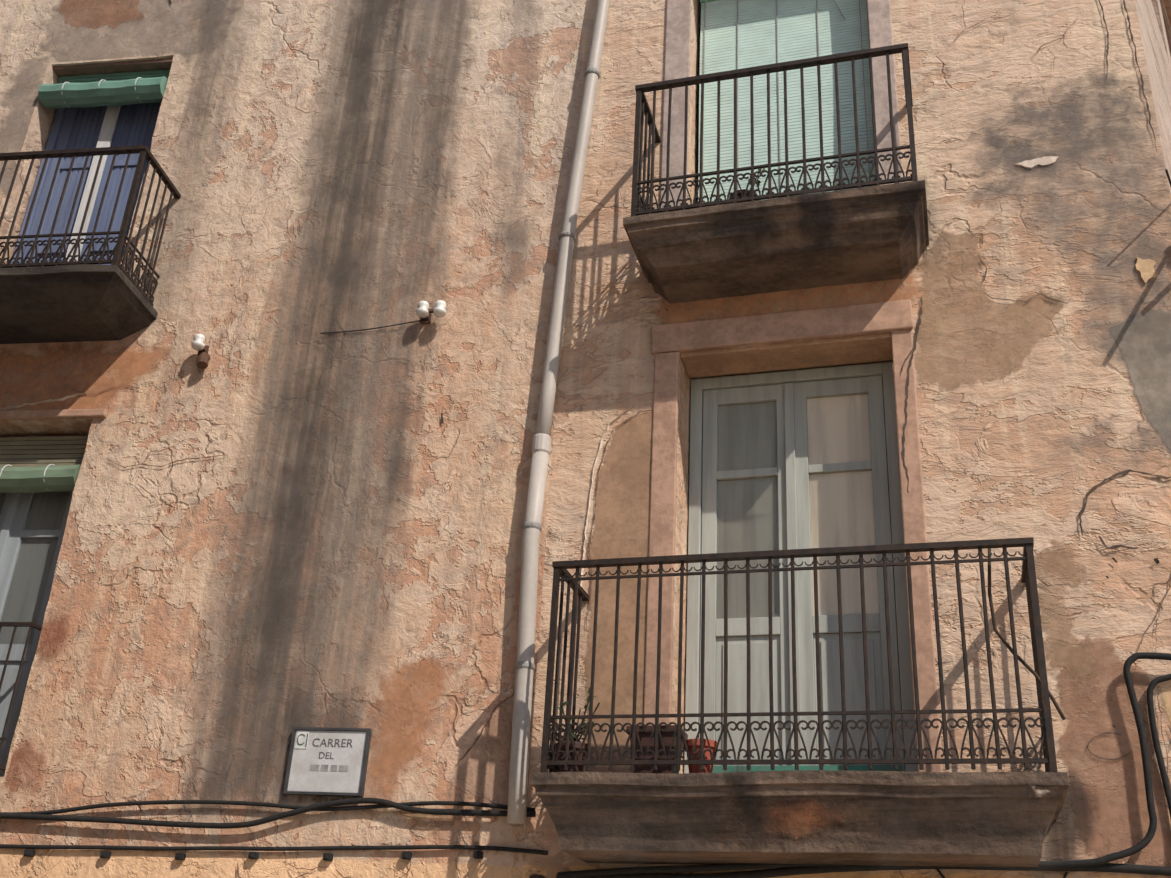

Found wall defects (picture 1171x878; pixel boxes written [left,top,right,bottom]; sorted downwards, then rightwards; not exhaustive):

crack [950,0,1019,44]
damp [991,103,1093,173]
crack [1030,0,1157,151]
flaking render [659,228,1066,390]
damp [1096,226,1163,291]
damp [202,0,452,800]
crack [900,298,923,493]
flaking render [1034,540,1077,586]
crack [1136,577,1171,661]
flaking render [1041,602,1171,867]